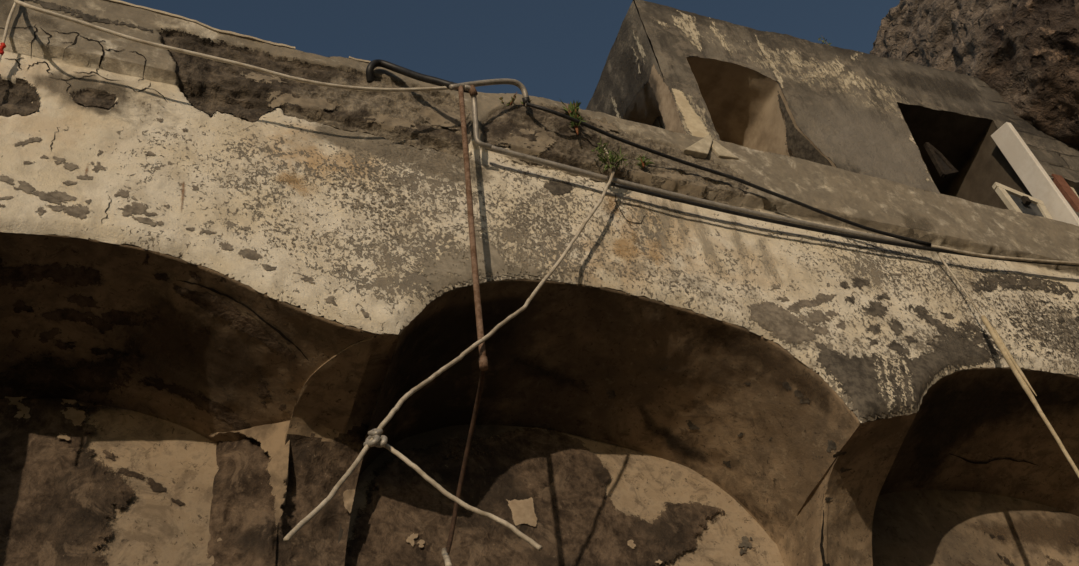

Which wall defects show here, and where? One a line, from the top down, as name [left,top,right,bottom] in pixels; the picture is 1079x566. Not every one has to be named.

flaking render [0,74,40,117]
crack [0,26,166,100]
peeling [14,137,42,146]
peeling [0,150,106,219]
flaking render [27,0,1079,419]
crack [178,280,309,361]
water stain [874,347,1079,485]
flaking render [345,426,725,566]
flaking render [738,536,753,555]